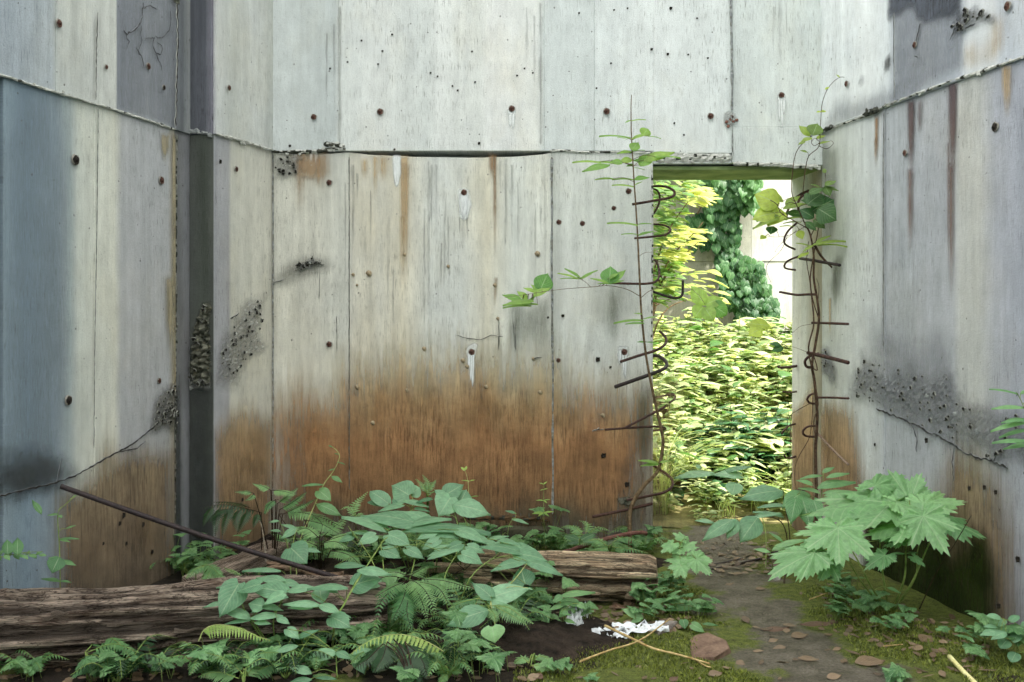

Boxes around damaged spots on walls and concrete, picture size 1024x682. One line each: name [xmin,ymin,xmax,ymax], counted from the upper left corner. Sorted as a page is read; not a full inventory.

spalling [950,7,991,32]
rust [902,101,920,157]
spalling [271,141,346,176]
rust [948,84,956,254]
crack [0,3,179,497]
spalling [295,258,321,270]
spalling [154,300,264,431]
efflorescence [465,343,477,385]
efflorescence [618,347,628,377]
spalling [777,349,1024,458]
rust [791,391,860,507]
rust [791,516,815,537]